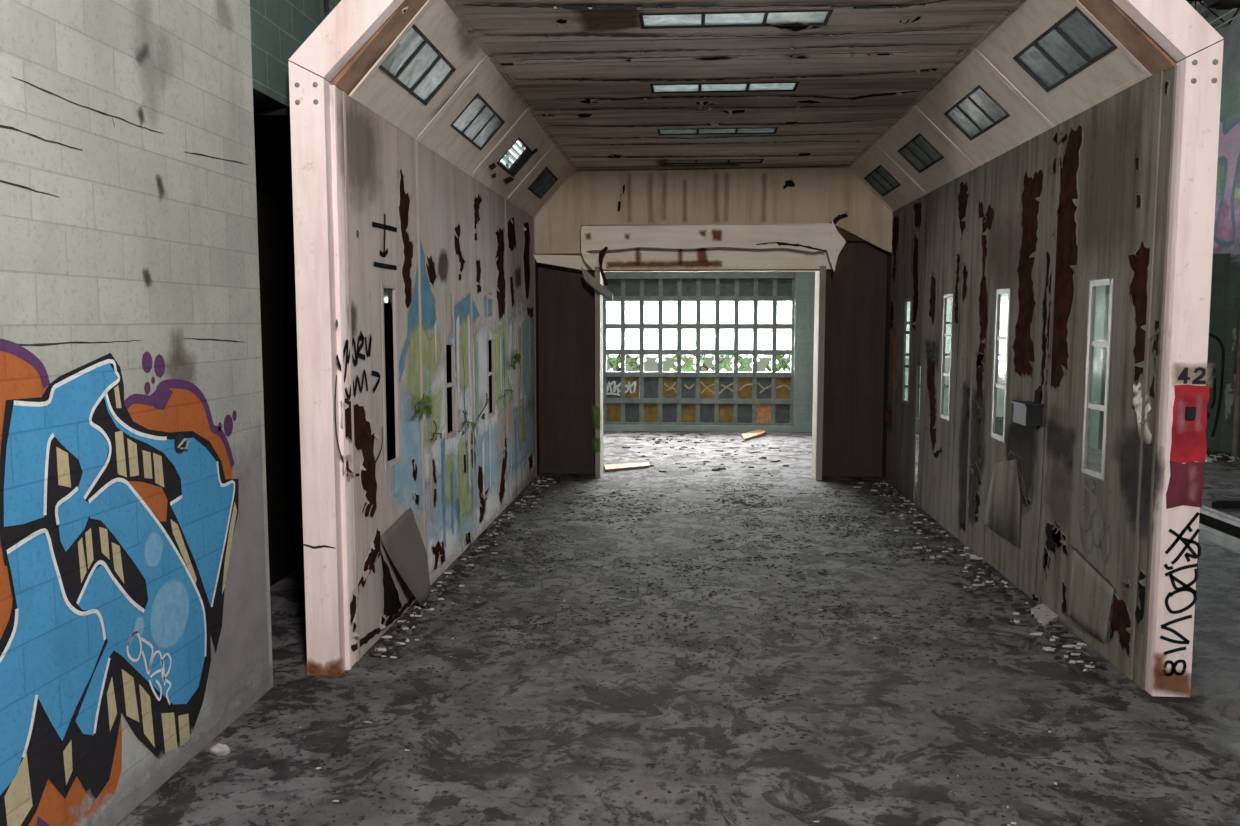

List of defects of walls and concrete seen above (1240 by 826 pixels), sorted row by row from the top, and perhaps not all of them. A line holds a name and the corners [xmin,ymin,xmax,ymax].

crack [462,0,985,171]
peeling [398,168,437,310]
peeling [1012,123,1084,404]
peeling [1128,240,1159,446]
peeling [340,396,381,638]